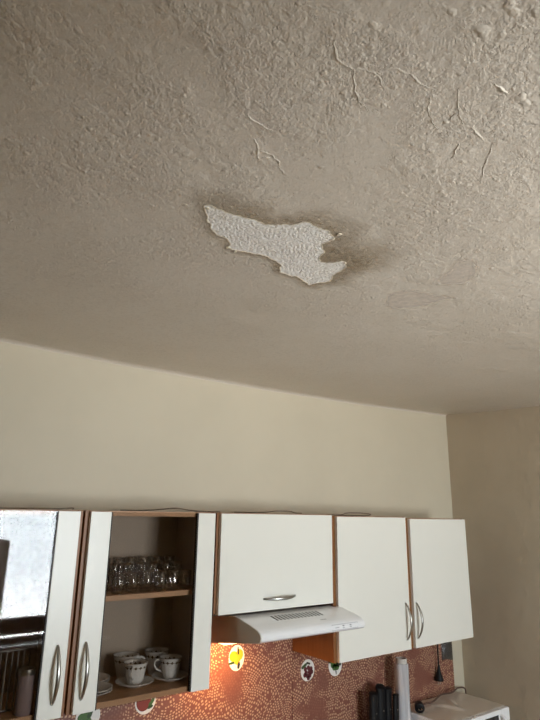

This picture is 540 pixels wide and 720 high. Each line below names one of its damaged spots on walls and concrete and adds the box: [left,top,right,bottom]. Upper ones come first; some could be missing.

peeling [203,205,347,285]
damp [284,218,344,263]